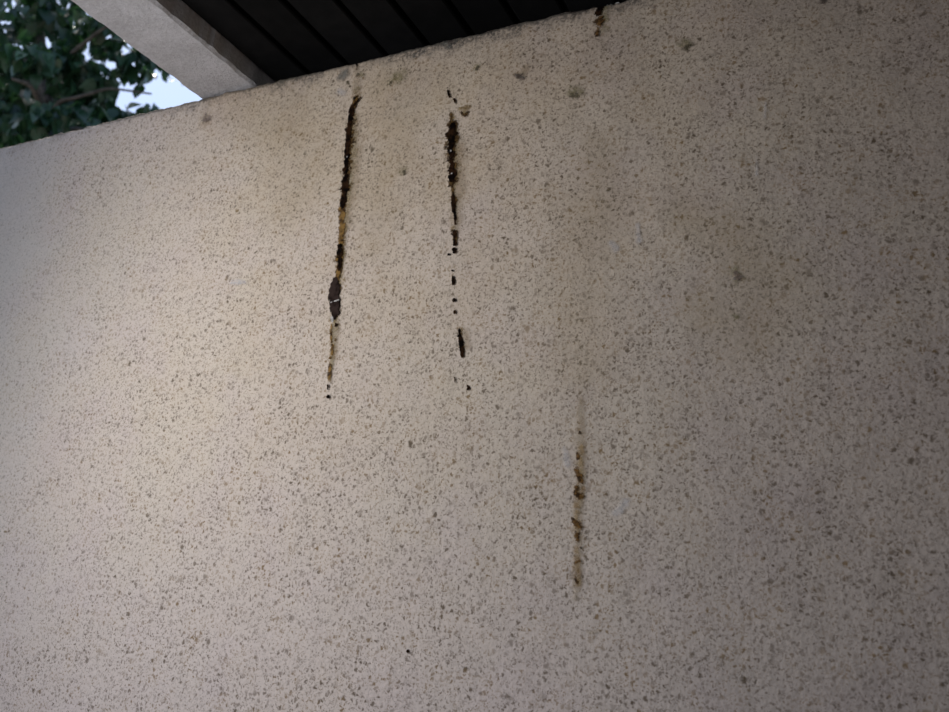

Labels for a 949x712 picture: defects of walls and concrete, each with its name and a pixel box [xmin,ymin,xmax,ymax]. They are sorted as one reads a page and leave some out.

crack [326,63,361,399]
crack [443,87,470,390]
rust [571,431,585,585]